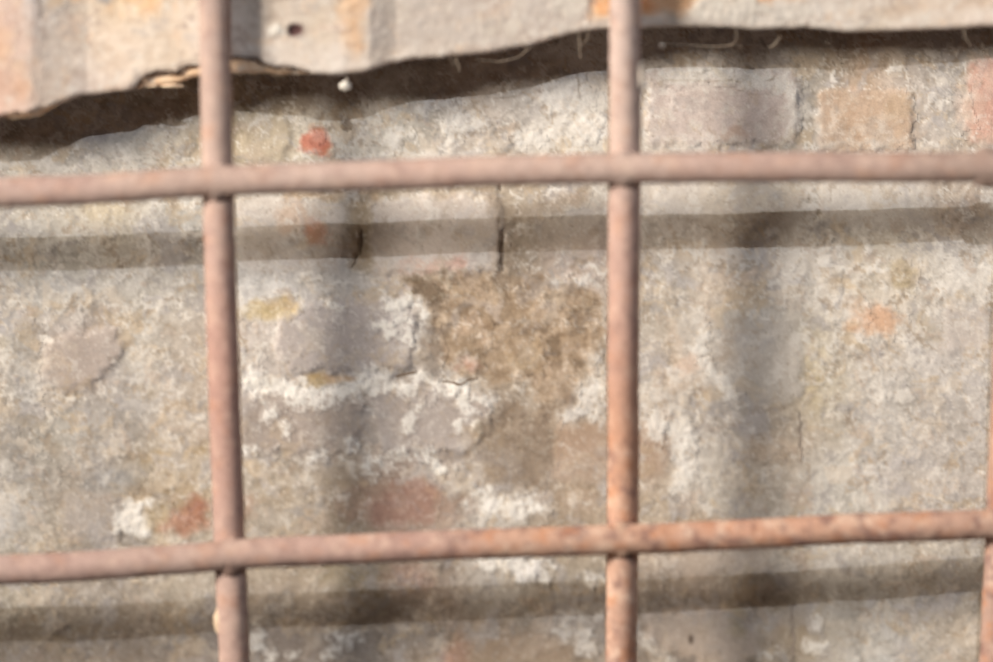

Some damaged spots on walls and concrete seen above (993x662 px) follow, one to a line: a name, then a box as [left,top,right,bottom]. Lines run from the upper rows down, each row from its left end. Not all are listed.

crack [134,63,197,89]
peeling [135,63,200,89]
crack [231,55,310,73]
peeling [231,58,313,76]
crack [351,229,363,268]
crack [497,233,505,271]
crack [395,369,417,377]
leakage [239,237,609,527]
crack [442,377,477,386]
leakage [472,557,559,590]
leakage [570,568,607,592]